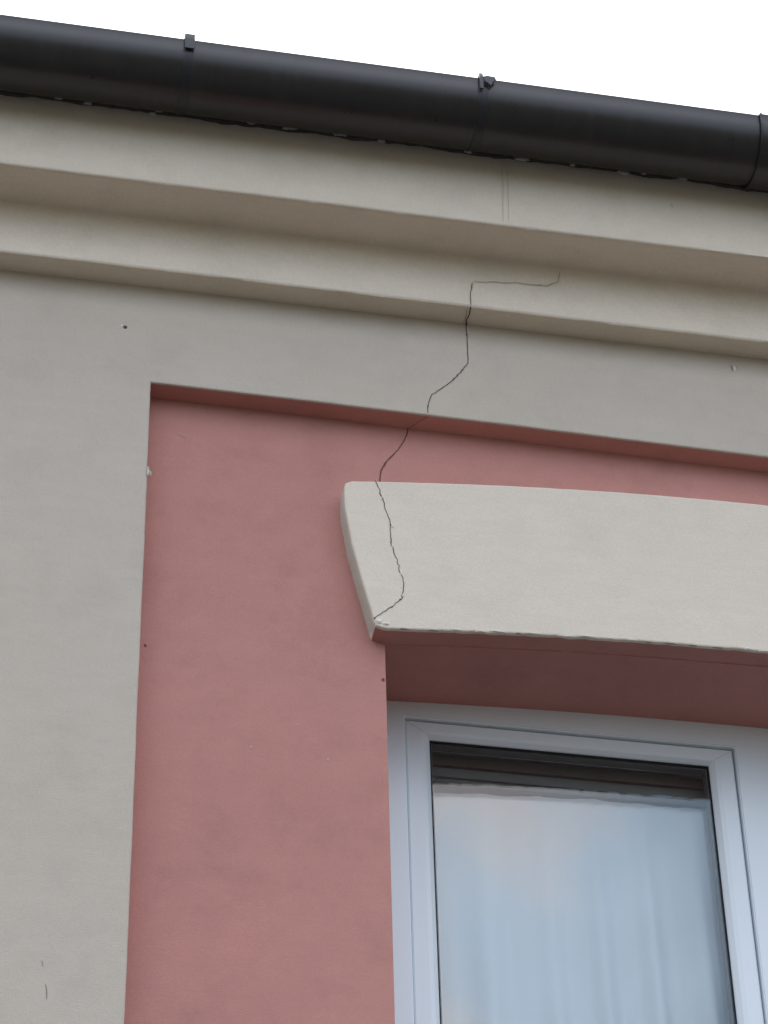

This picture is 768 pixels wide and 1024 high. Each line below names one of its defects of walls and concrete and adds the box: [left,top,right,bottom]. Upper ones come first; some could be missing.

crack [375,273,560,618]